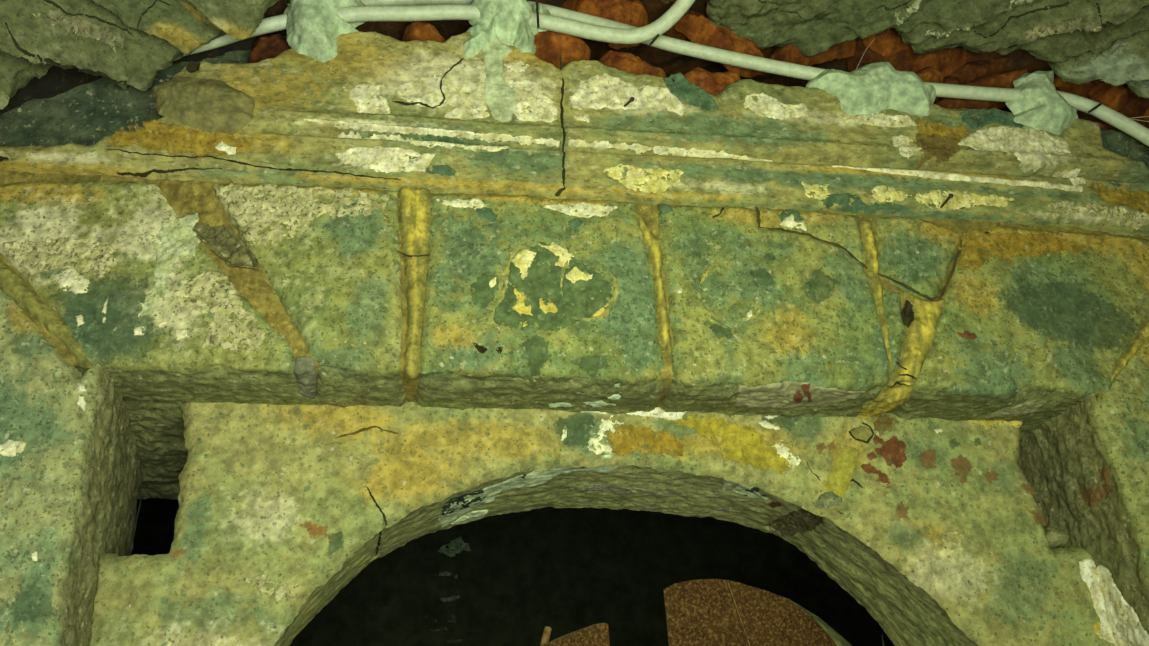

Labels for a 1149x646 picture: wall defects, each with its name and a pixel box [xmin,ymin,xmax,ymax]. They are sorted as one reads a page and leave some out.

crack [392,58,464,109]
crack [105,148,401,181]
peeling [304,61,773,213]
crack [555,55,566,196]
peeling [801,108,1086,215]
crack [755,207,963,301]
peeling [469,242,612,375]
leakage [1000,279,1137,355]
peeling [549,383,686,446]
corrosion [794,383,813,403]
corrosion [861,414,936,488]
corrosion [950,455,971,483]